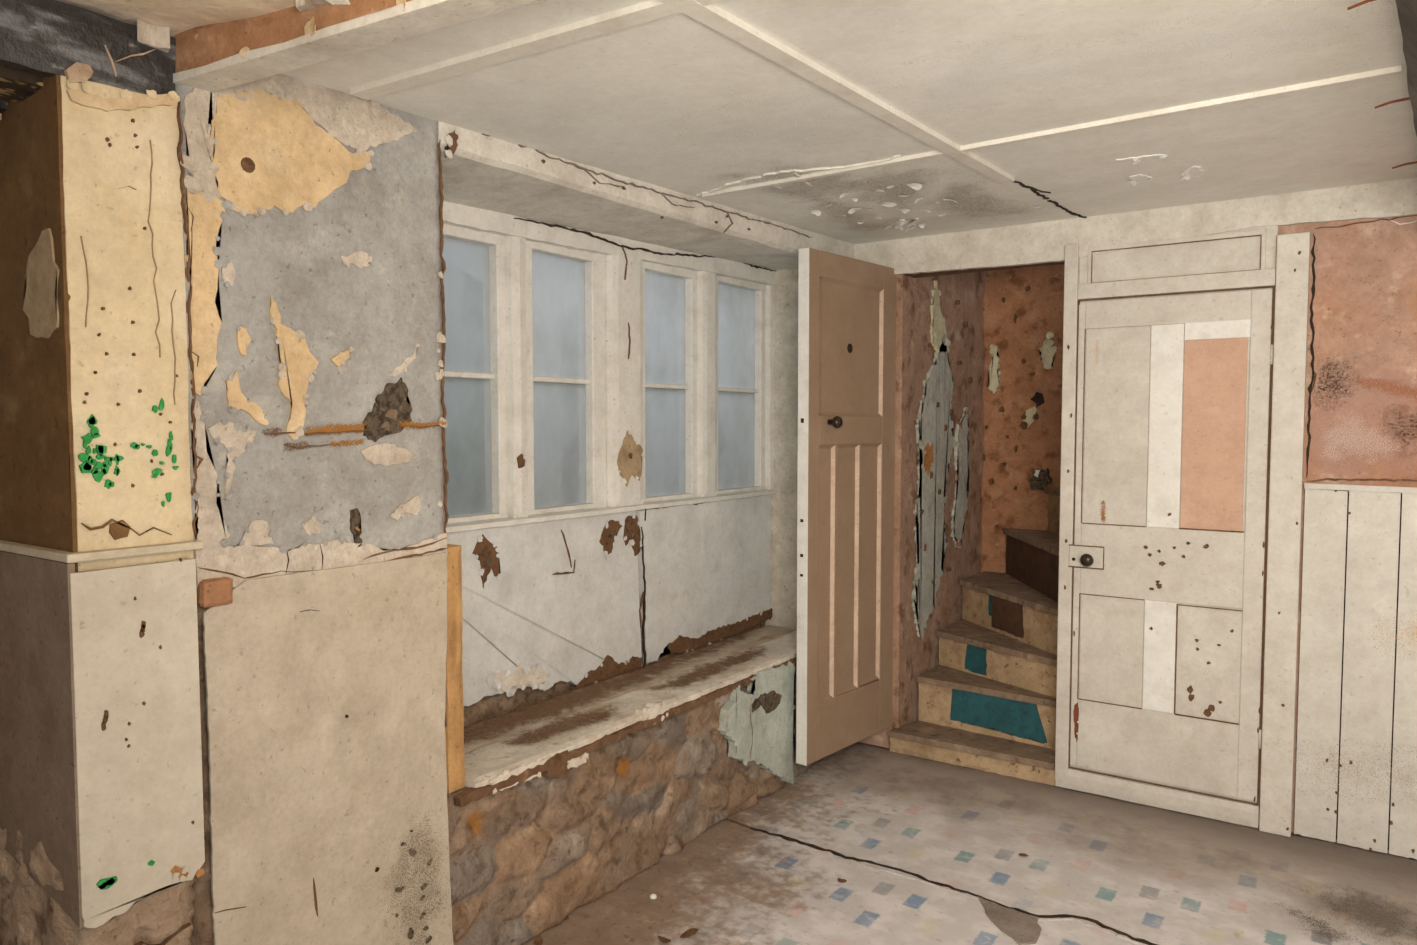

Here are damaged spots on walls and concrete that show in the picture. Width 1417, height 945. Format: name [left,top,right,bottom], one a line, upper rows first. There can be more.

crack [1014,181,1087,218]
peeling [64,17,461,588]
peeling [1021,332,1070,376]
peeling [911,280,1044,639]
flaking render [1014,468,1070,491]
peeling [472,534,501,588]
peeling [599,513,642,561]
flaking render [718,661,796,784]
peeling [96,876,118,890]
peeling [171,866,205,882]
crack [725,818,1158,945]